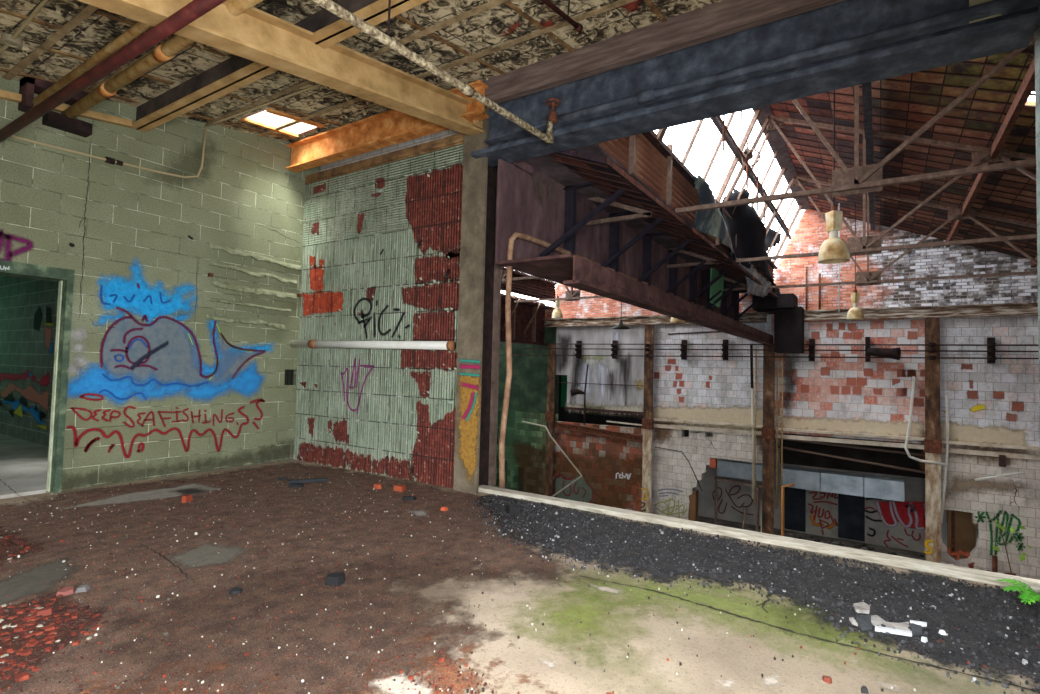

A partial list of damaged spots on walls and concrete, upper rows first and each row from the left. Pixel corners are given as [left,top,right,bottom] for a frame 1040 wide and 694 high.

rust [241,108,324,138]
peeling [295,164,463,488]
peeling [806,322,862,347]
peeling [654,359,684,402]
damp [559,335,924,437]
peeling [821,352,925,406]